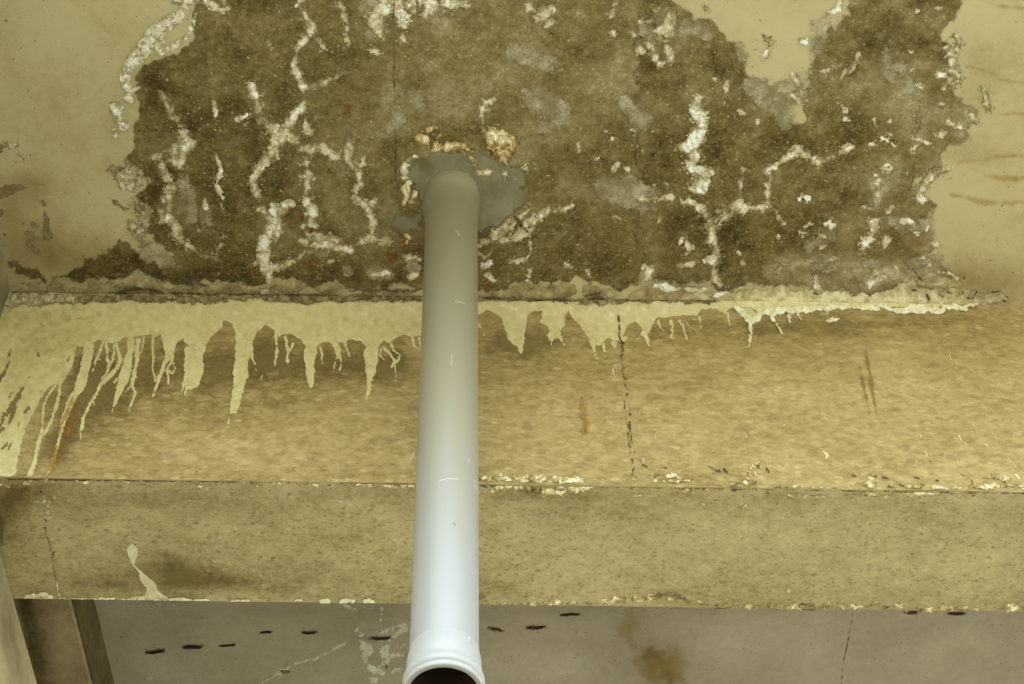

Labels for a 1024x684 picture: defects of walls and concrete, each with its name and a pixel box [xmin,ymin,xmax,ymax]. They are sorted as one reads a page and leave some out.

damp [0,0,1005,477]
crack [483,291,773,490]
crack [7,479,252,580]
damp [24,544,246,606]